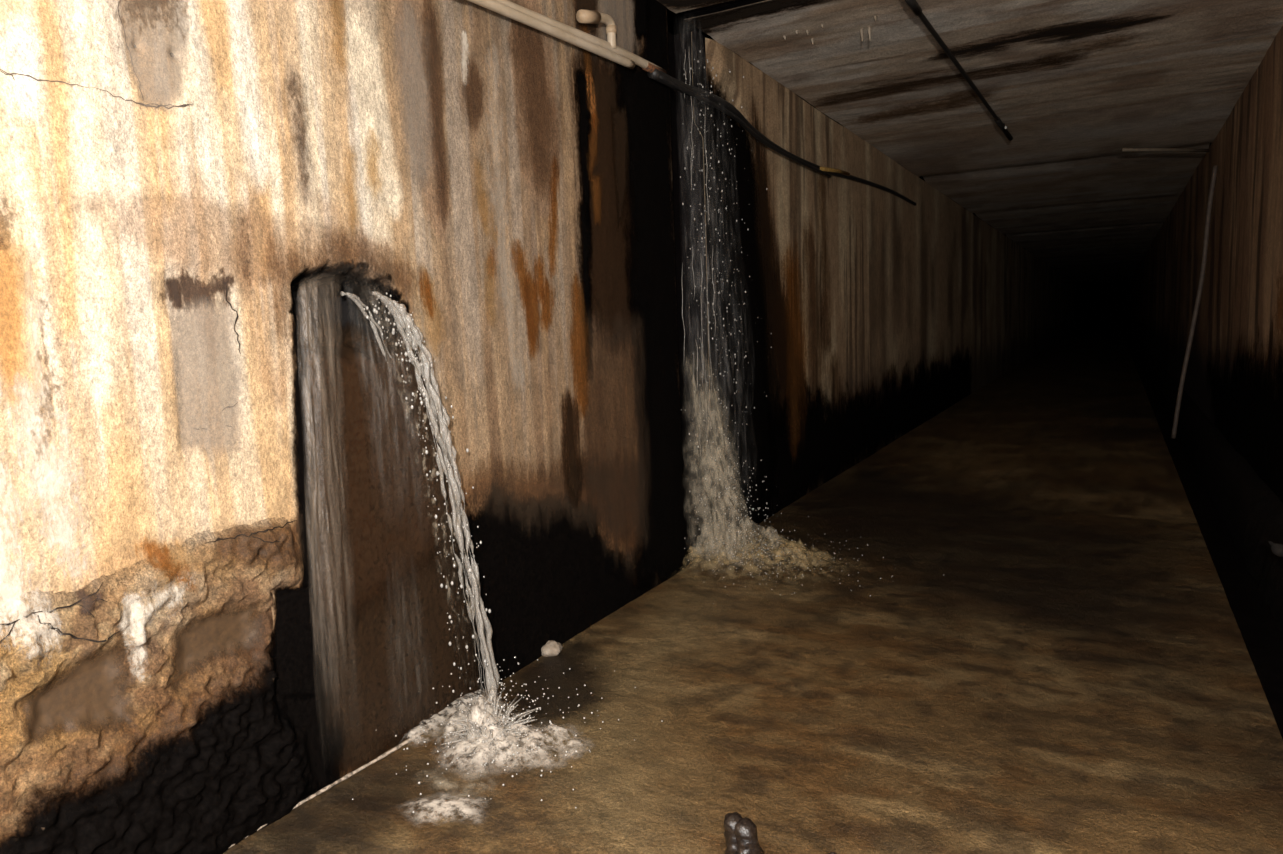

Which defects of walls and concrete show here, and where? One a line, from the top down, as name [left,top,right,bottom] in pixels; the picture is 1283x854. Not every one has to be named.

damp [929,15,1169,60]
crack [0,69,192,106]
damp [693,75,971,546]
damp [0,0,831,854]
crack [205,520,297,544]
crack [0,582,118,643]
spalling [173,604,261,689]
spalling [23,639,133,741]